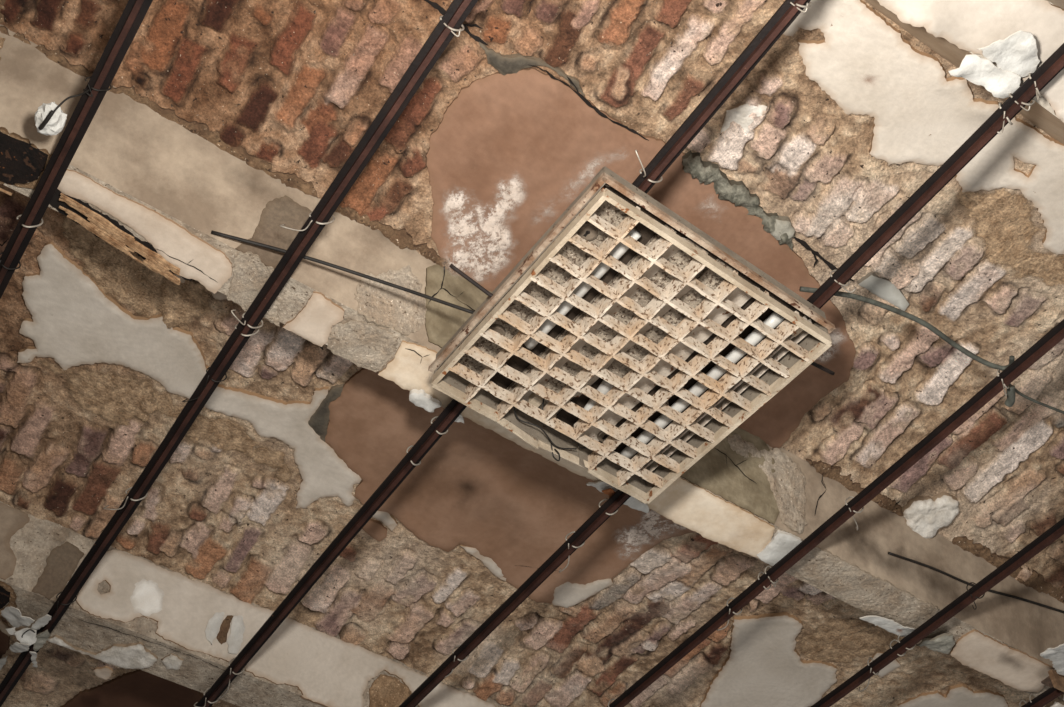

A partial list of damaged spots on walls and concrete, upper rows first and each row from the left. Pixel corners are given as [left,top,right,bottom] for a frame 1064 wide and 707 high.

crack [424,0,488,45]
crack [530,65,649,141]
flaking render [783,0,1064,166]
flaking render [17,82,318,426]
spalling [263,264,453,409]
spalling [335,205,458,275]
water stain [444,178,524,281]
spalling [490,183,816,460]
flaking render [955,117,1064,286]
flaking render [185,384,362,509]
water stain [618,510,686,556]
flaking render [647,434,1064,707]